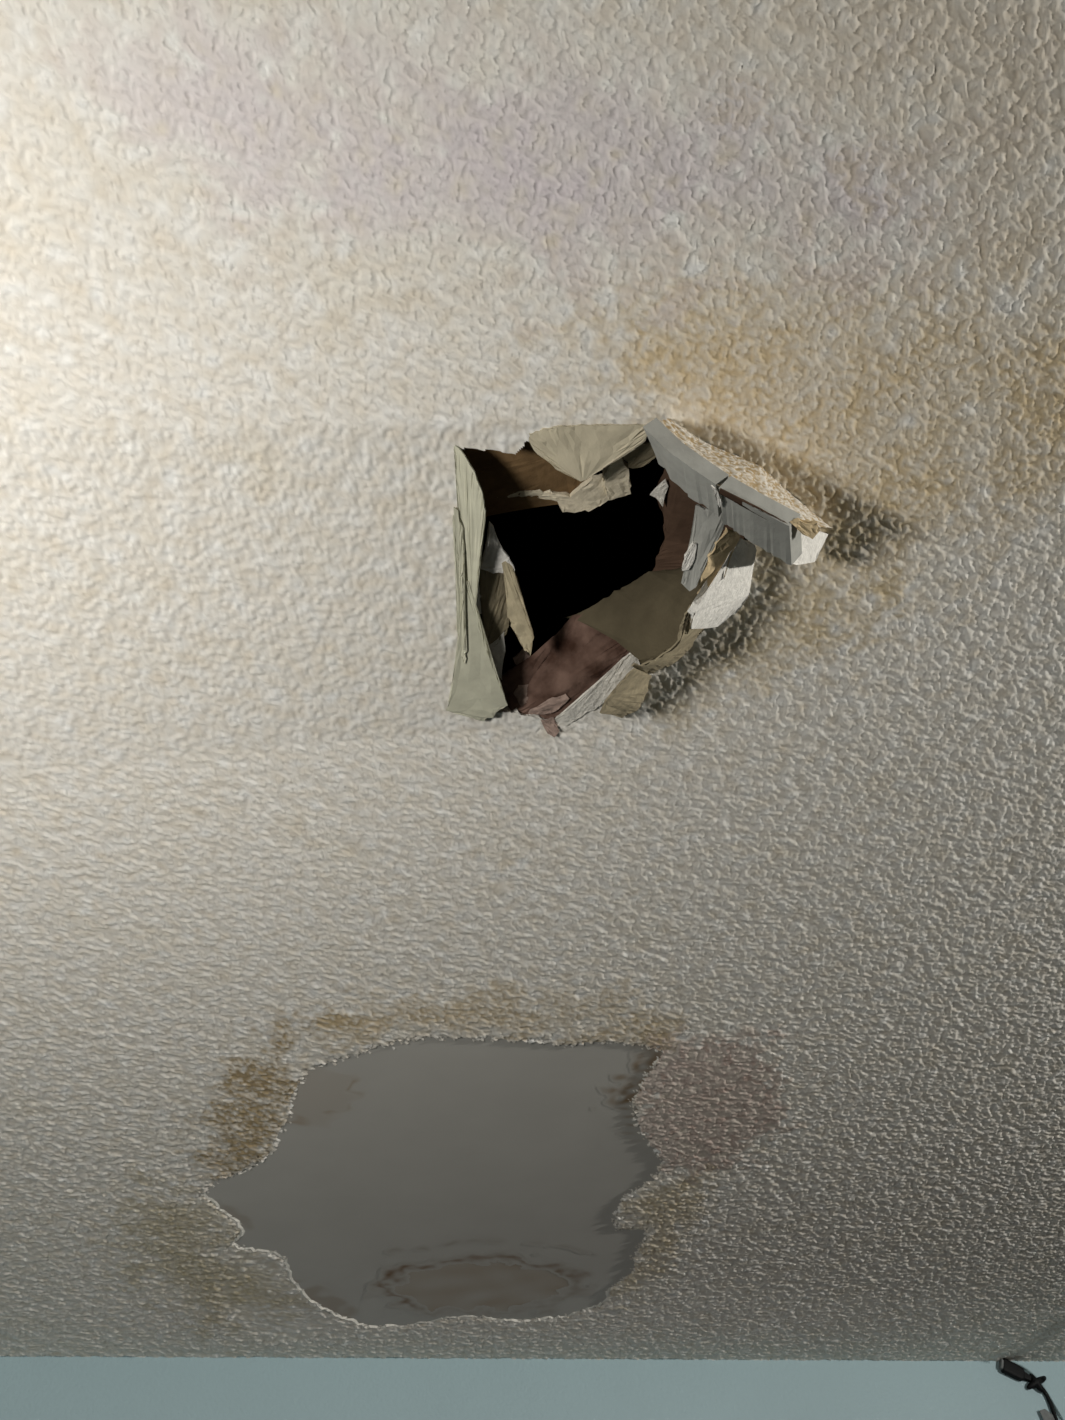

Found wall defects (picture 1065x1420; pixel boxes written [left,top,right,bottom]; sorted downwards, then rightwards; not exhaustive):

water stain [53,958,824,1346]